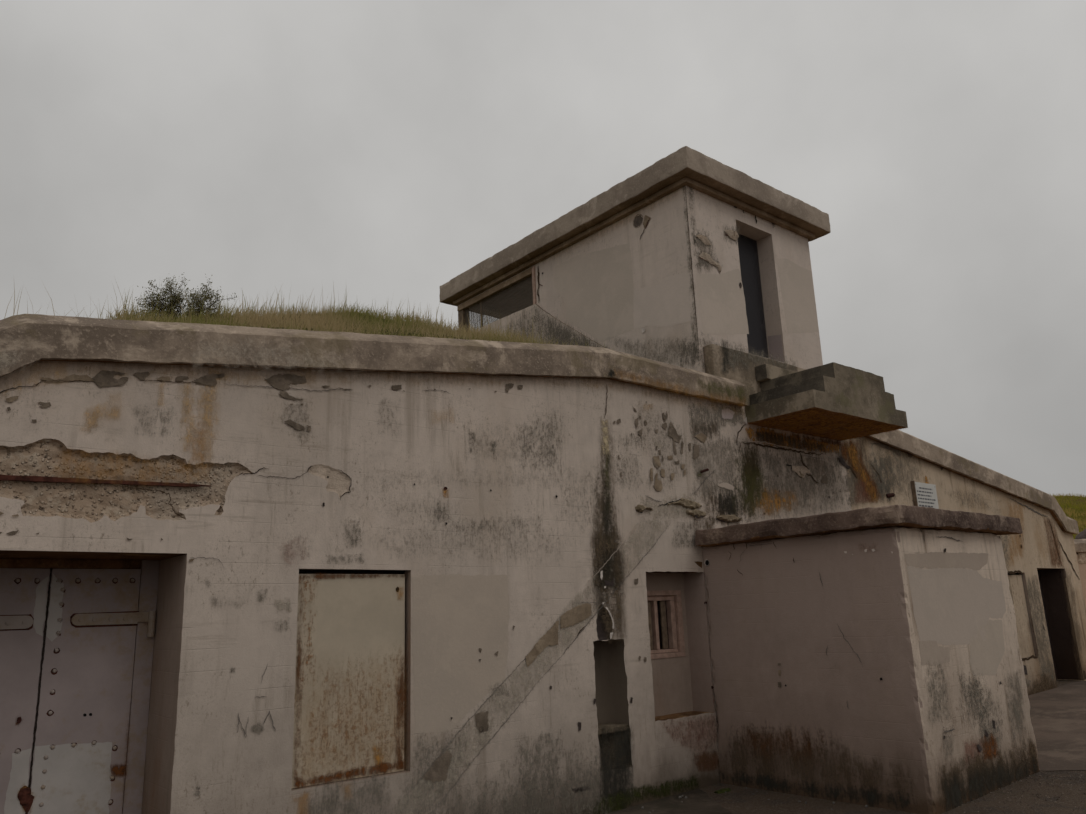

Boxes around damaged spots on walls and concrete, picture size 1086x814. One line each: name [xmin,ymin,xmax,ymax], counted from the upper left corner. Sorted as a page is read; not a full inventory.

crack [0,380,89,393]
peeling [41,370,225,388]
peeling [265,374,307,405]
spalling [0,439,254,523]
spalling [307,464,352,500]
peeling [617,402,691,491]
damp [675,383,843,547]
damp [594,421,624,637]
rust [296,574,405,688]
rust [18,786,35,814]
rust [111,765,126,776]
rust [295,667,406,814]